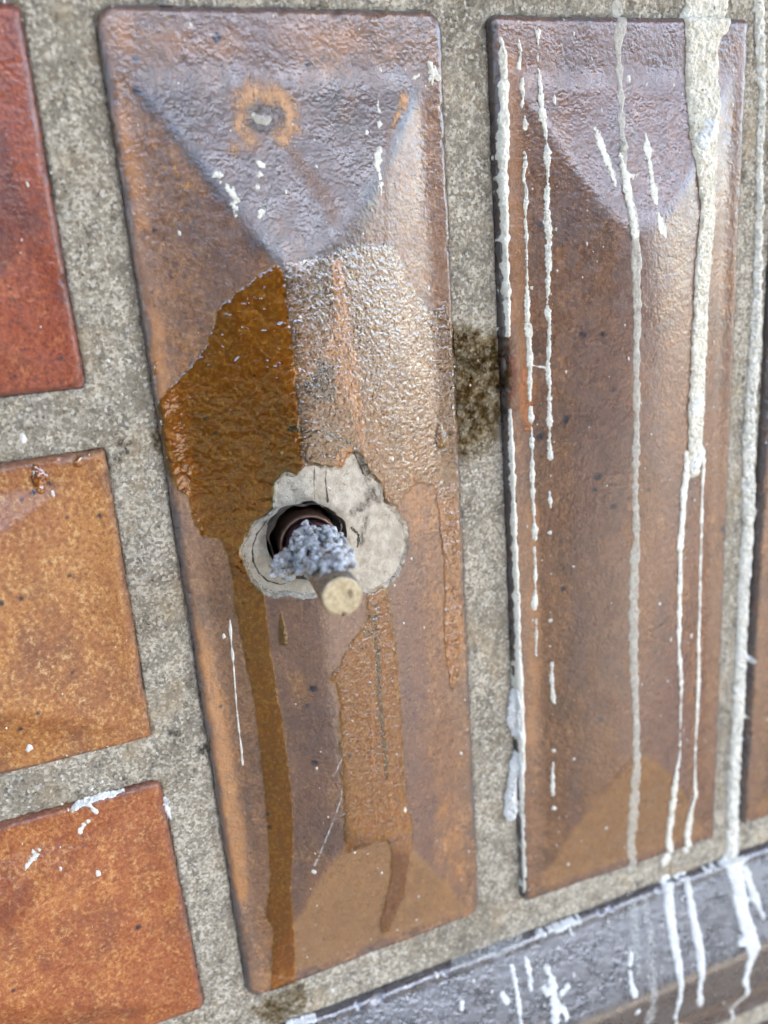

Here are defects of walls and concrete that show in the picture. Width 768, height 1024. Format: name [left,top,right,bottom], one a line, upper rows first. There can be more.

corrosion [231,84,300,152]
spalling [238,451,409,600]
corrosion [324,259,368,467]
water stain [453,333,527,893]
water stain [491,37,512,337]
water stain [611,0,642,874]
water stain [679,0,731,478]
water stain [723,0,767,1023]
water stain [509,956,533,1024]
water stain [659,871,705,1024]